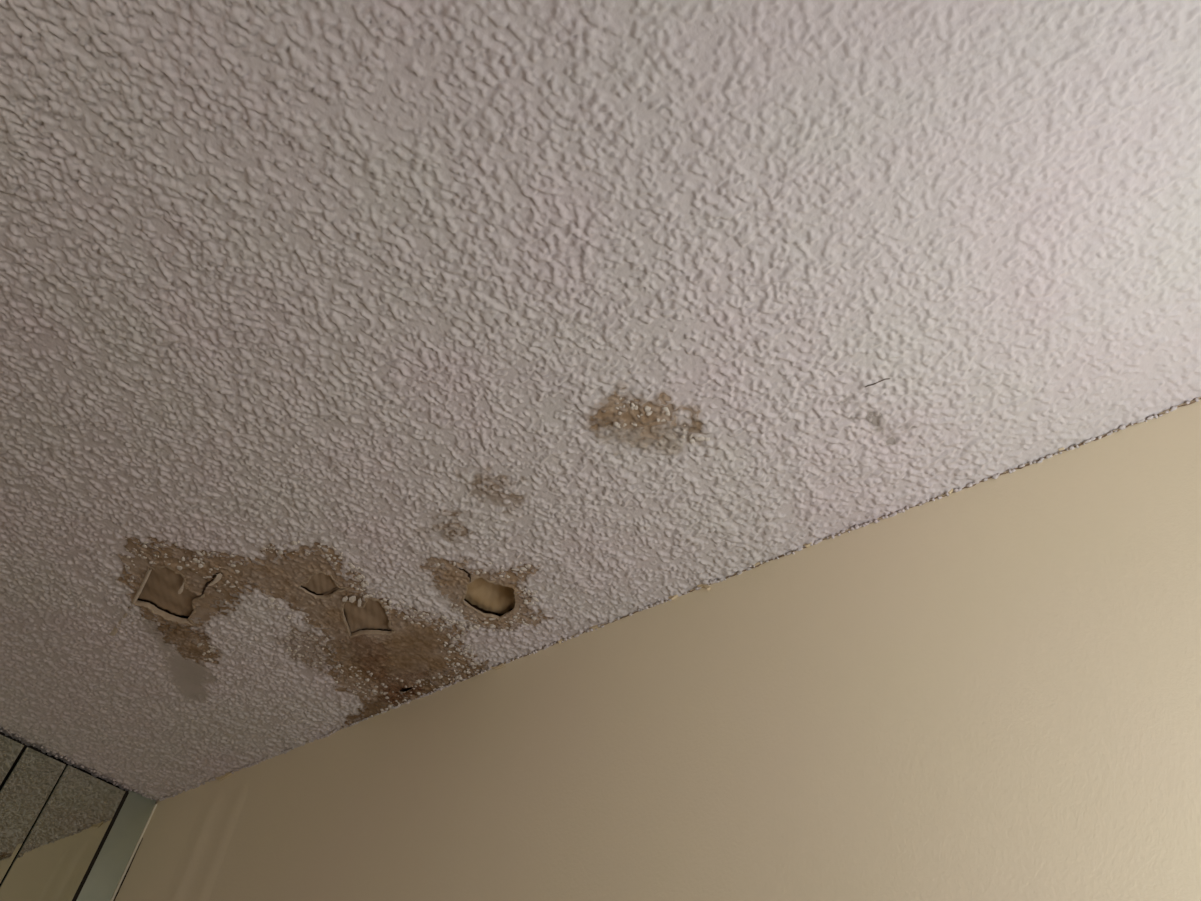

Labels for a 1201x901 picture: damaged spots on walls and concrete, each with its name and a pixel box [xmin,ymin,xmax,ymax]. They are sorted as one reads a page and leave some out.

damp [590,388,710,446]
damp [472,476,523,499]
damp [117,537,553,727]